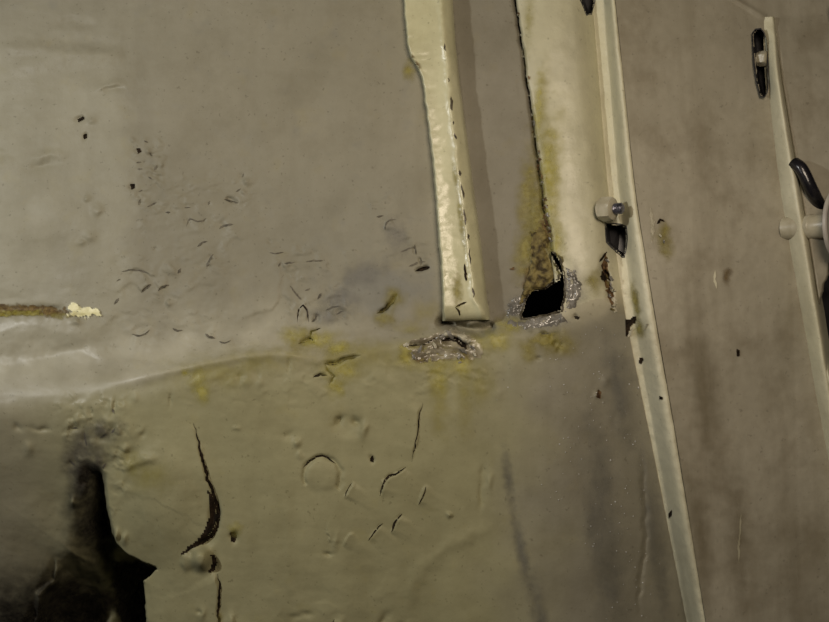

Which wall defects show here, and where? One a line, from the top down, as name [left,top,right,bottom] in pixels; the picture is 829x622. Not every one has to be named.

corrosion [519,134,561,258]
peeling [599,252,618,313]
corrosion [0,304,68,319]
peeling [67,302,101,317]
peeling [625,316,636,337]
peeling [403,328,483,363]
crack [380,405,423,494]
crack [181,423,221,622]
crack [369,514,402,539]